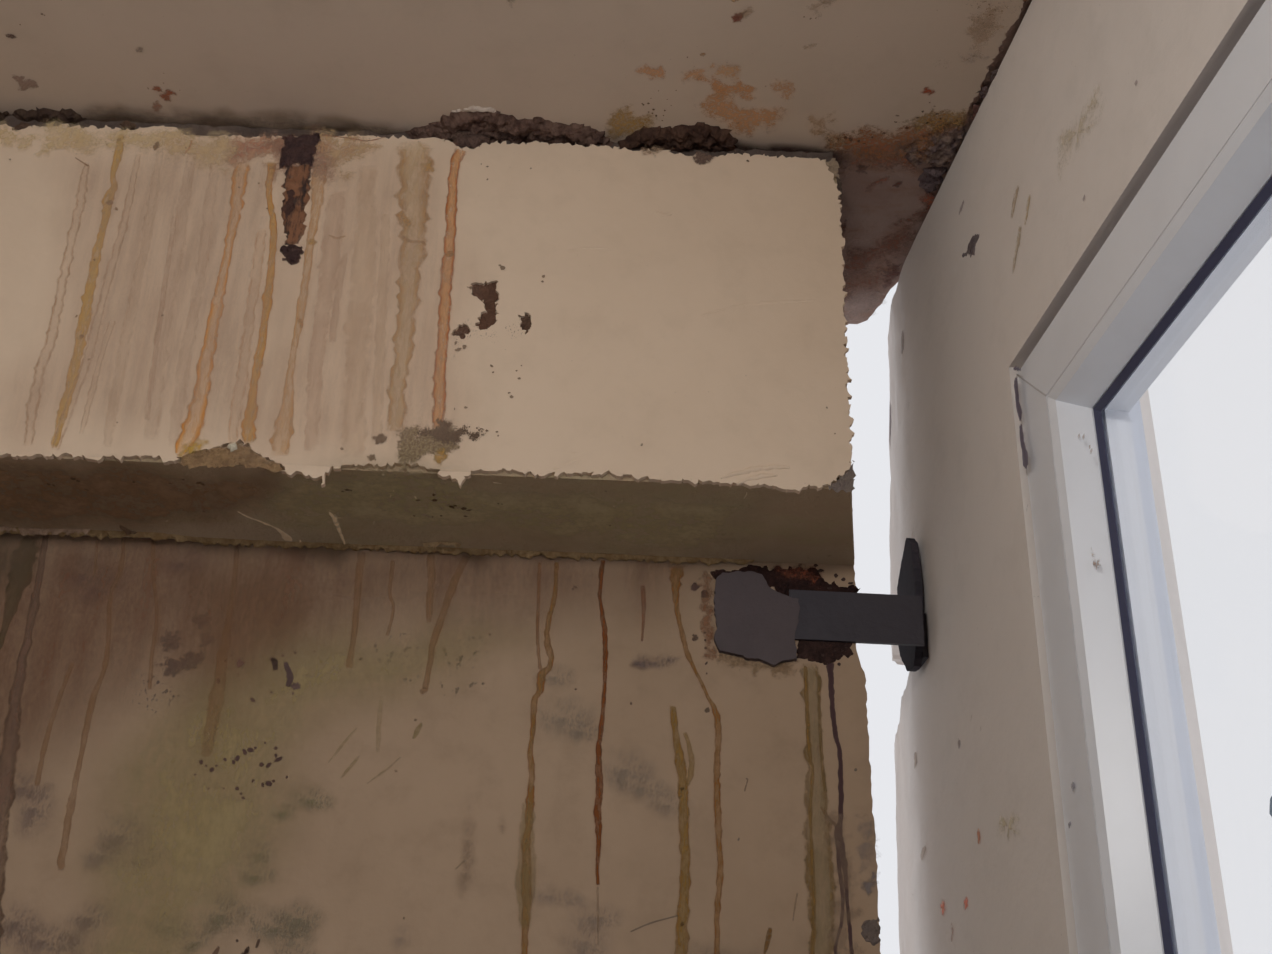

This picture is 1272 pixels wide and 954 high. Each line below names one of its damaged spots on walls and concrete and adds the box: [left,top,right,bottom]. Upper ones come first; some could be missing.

spalling [404,105,738,153]
rust [51,135,124,447]
rust [175,131,378,454]
rust [387,145,434,429]
mould [367,418,499,469]
rust [432,150,465,427]
spalling [453,265,532,351]
water stain [0,536,405,952]
rust [521,563,559,954]
rust [593,560,608,885]
rust [670,568,724,954]